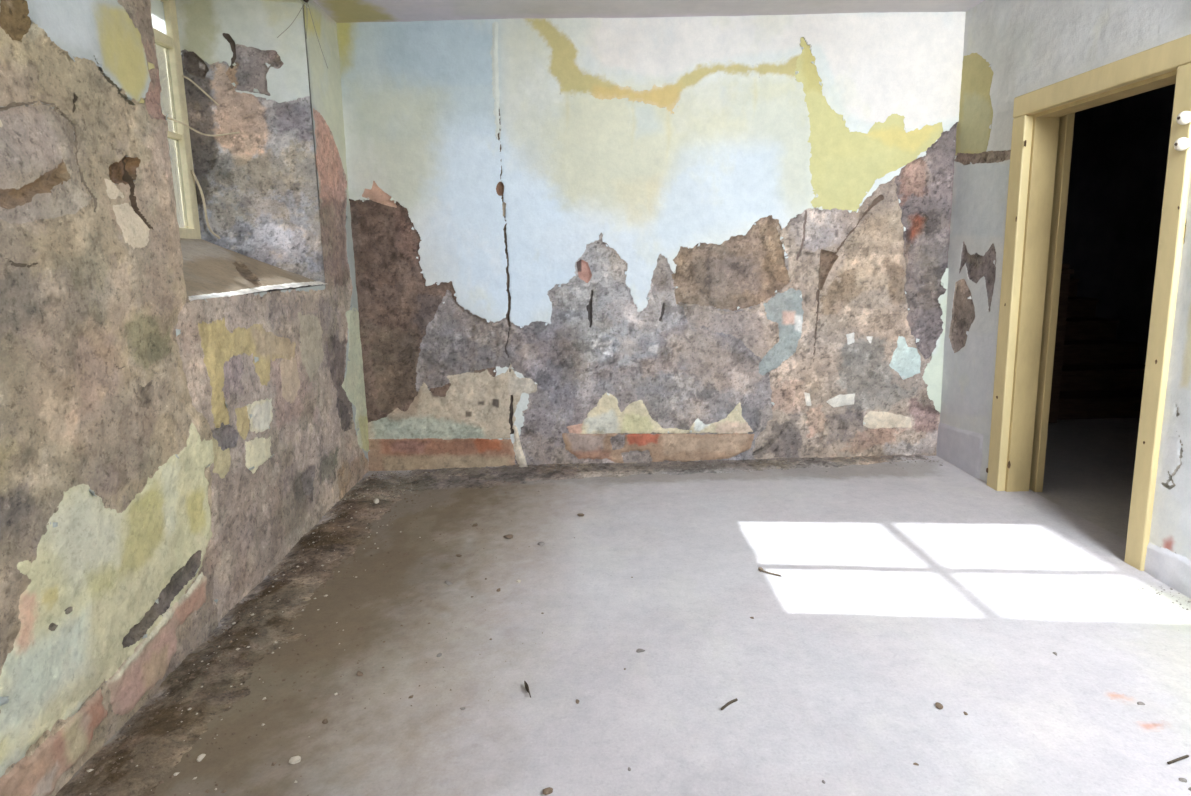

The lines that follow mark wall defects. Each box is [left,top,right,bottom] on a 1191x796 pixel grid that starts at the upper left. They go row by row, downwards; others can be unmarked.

crack [0,93,97,212]
crack [95,59,135,105]
crack [122,155,153,229]
flaking render [0,0,370,796]
crack [496,114,514,434]
flaking render [349,37,1011,465]